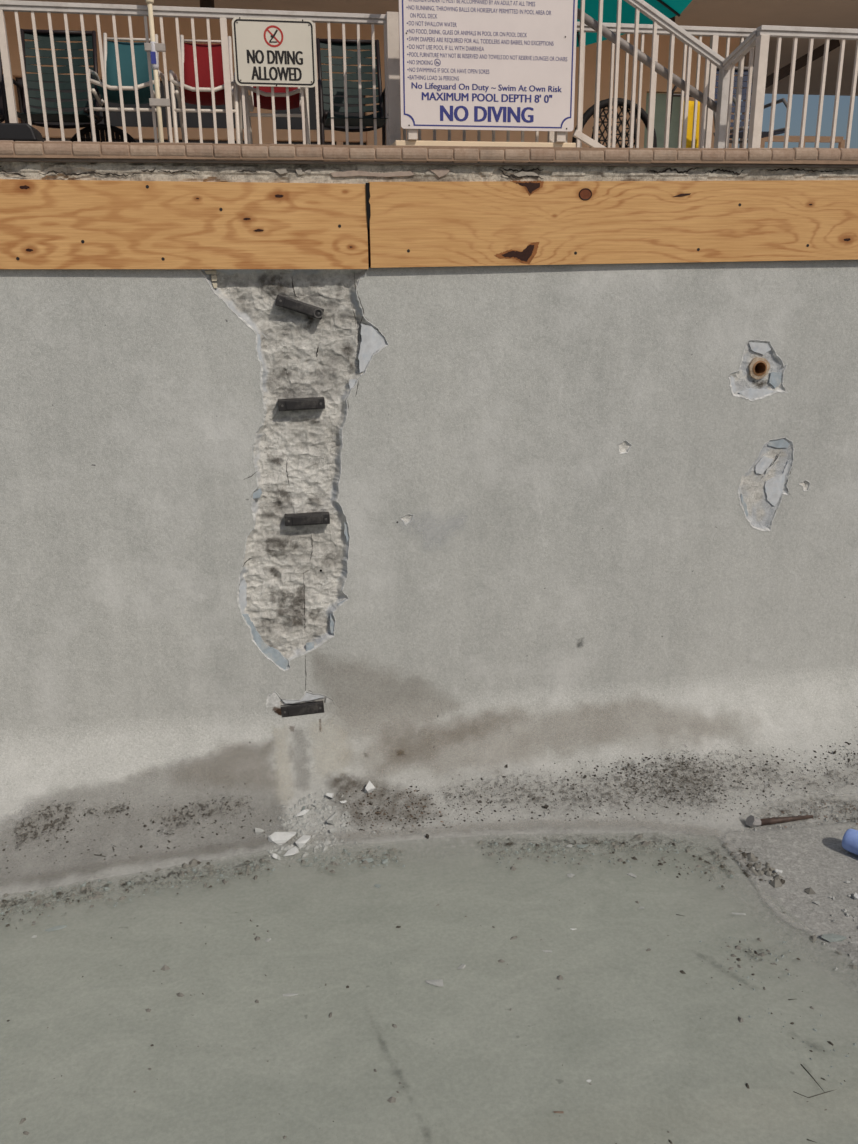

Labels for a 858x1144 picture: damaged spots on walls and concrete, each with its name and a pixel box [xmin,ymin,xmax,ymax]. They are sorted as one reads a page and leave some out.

flaking render [728,339,788,401]
spalling [199,269,389,672]
flaking render [737,437,810,532]
flaking render [265,691,336,712]